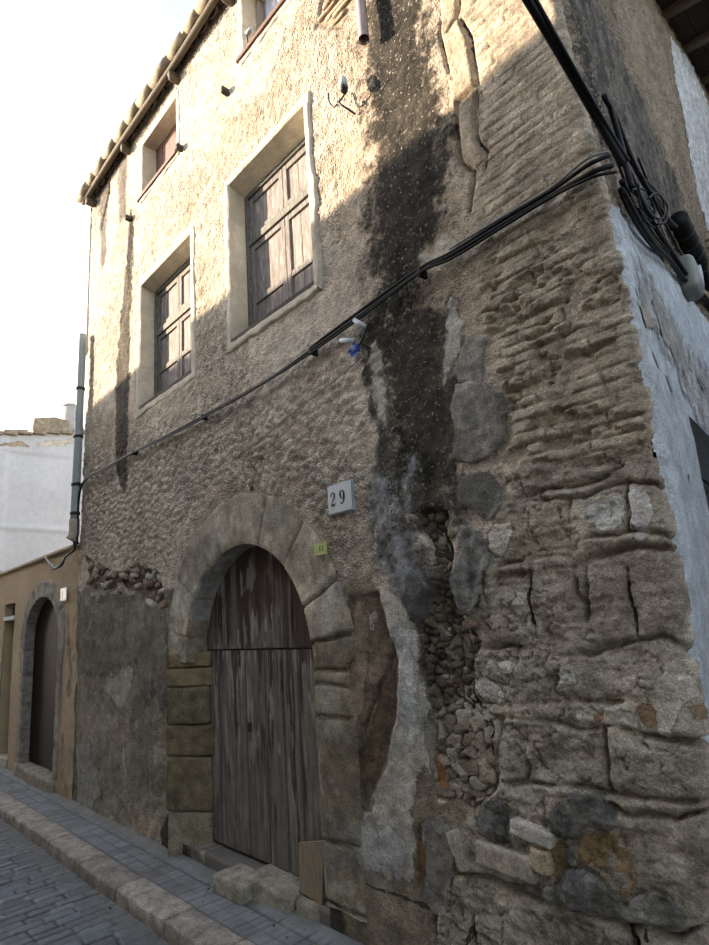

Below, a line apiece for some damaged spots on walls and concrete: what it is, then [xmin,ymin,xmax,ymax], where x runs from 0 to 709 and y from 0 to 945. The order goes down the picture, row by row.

spalling [317,0,355,30]
damp [99,153,134,492]
peeling [635,256,709,435]
damp [352,0,470,893]
spalling [86,555,168,609]
spalling [406,512,498,806]
crack [527,577,536,626]
crack [627,581,640,637]